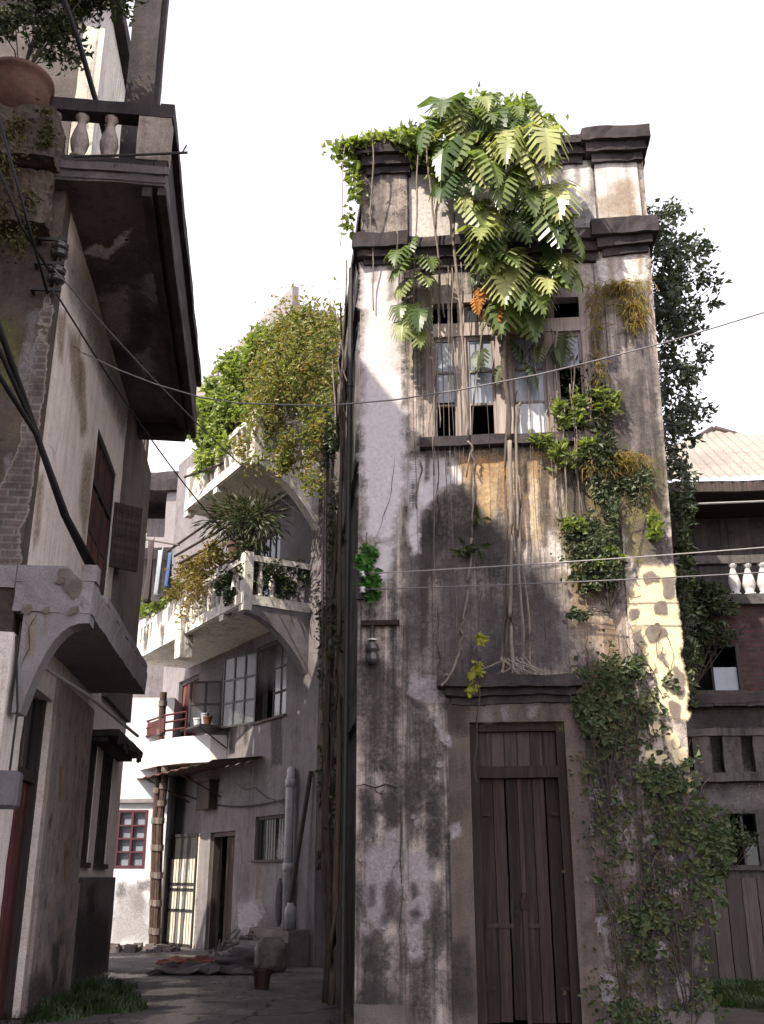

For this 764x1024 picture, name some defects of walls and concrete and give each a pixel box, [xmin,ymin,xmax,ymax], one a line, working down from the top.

spalling [0,293,54,565]
water stain [405,454,555,668]
water stain [493,454,586,530]
water stain [358,660,447,863]
crack [357,784,403,961]
water stain [361,881,399,1005]
water stain [410,885,473,1012]